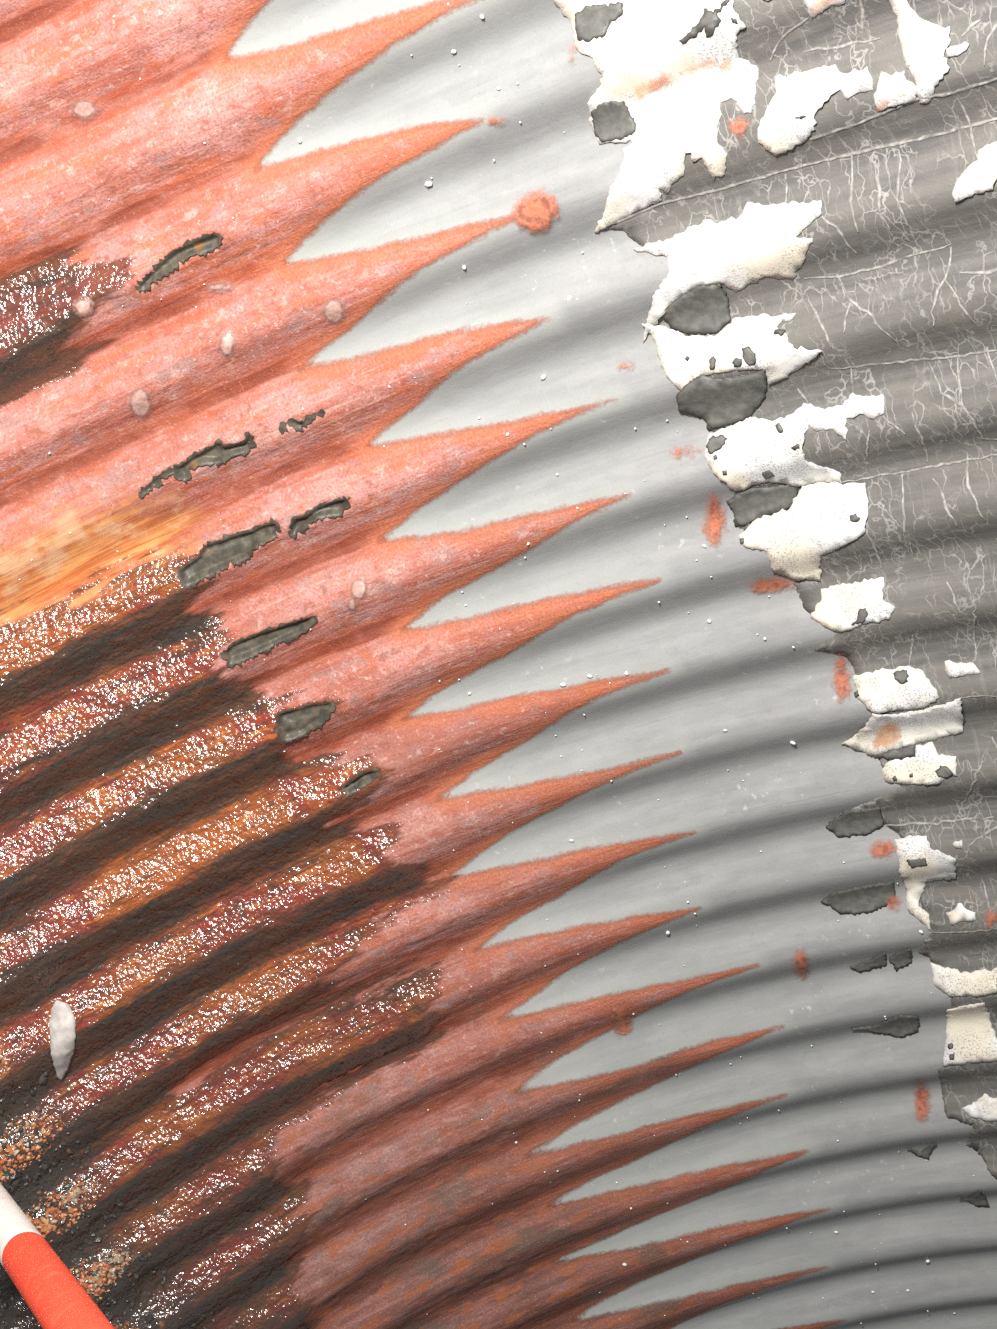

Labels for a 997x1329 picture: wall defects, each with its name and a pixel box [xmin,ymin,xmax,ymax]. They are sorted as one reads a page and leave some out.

crack [770,0,880,60]
crack [962,19,997,65]
peeling [553,0,969,233]
crack [957,98,979,160]
rust [0,0,660,776]
peeling [634,200,895,633]
rust [702,496,726,545]
rust [834,657,851,698]
peeling [841,665,964,786]
peeling [821,835,962,930]
rust [164,669,824,1329]
peeling [931,962,997,1067]